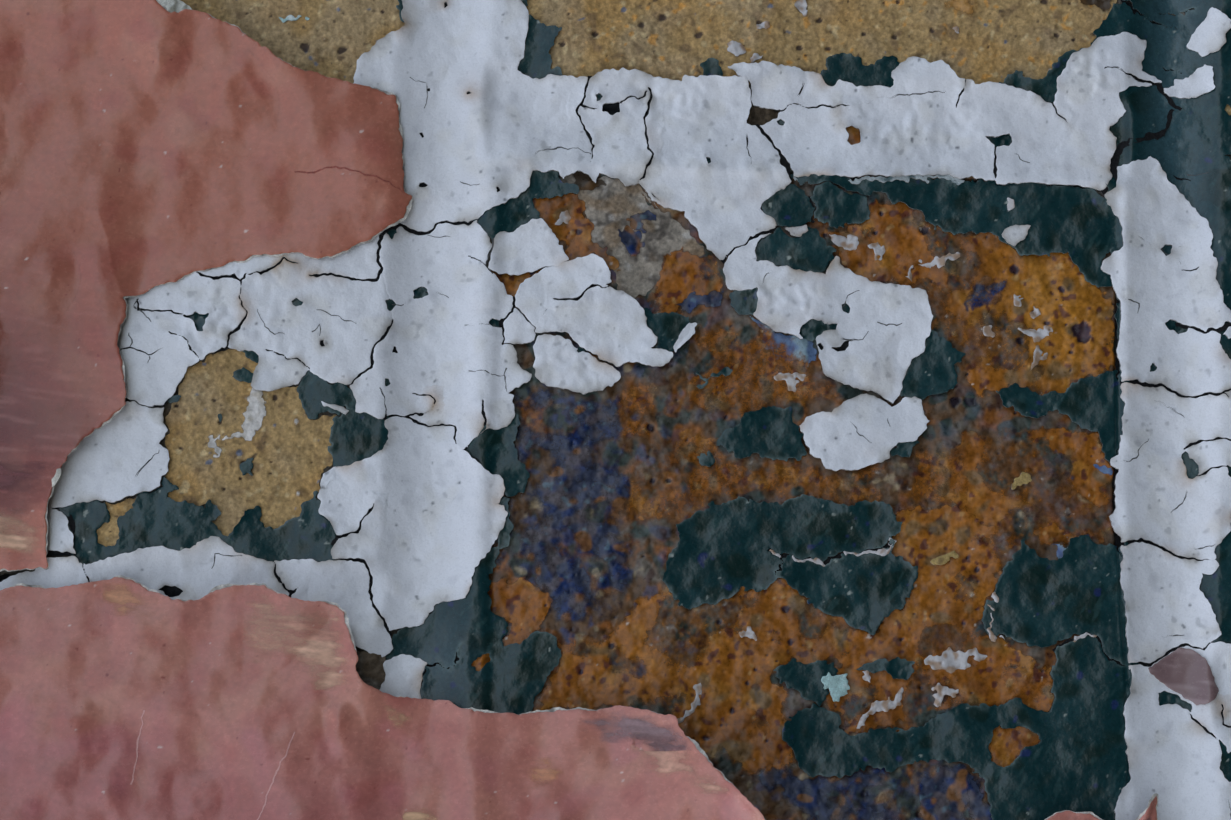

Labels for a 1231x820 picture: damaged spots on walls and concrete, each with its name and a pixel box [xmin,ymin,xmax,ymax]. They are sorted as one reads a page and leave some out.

crack [536,76,654,180]
crack [746,80,966,223]
crack [1101,66,1182,195]
crack [120,219,516,465]
peeling [47,0,1162,631]
crack [1175,322,1231,334]
crack [331,504,392,660]
rust [487,169,1121,820]
crack [1121,539,1214,561]
crack [1120,379,1231,511]
rust [471,653,490,671]
peeling [1044,810,1103,820]